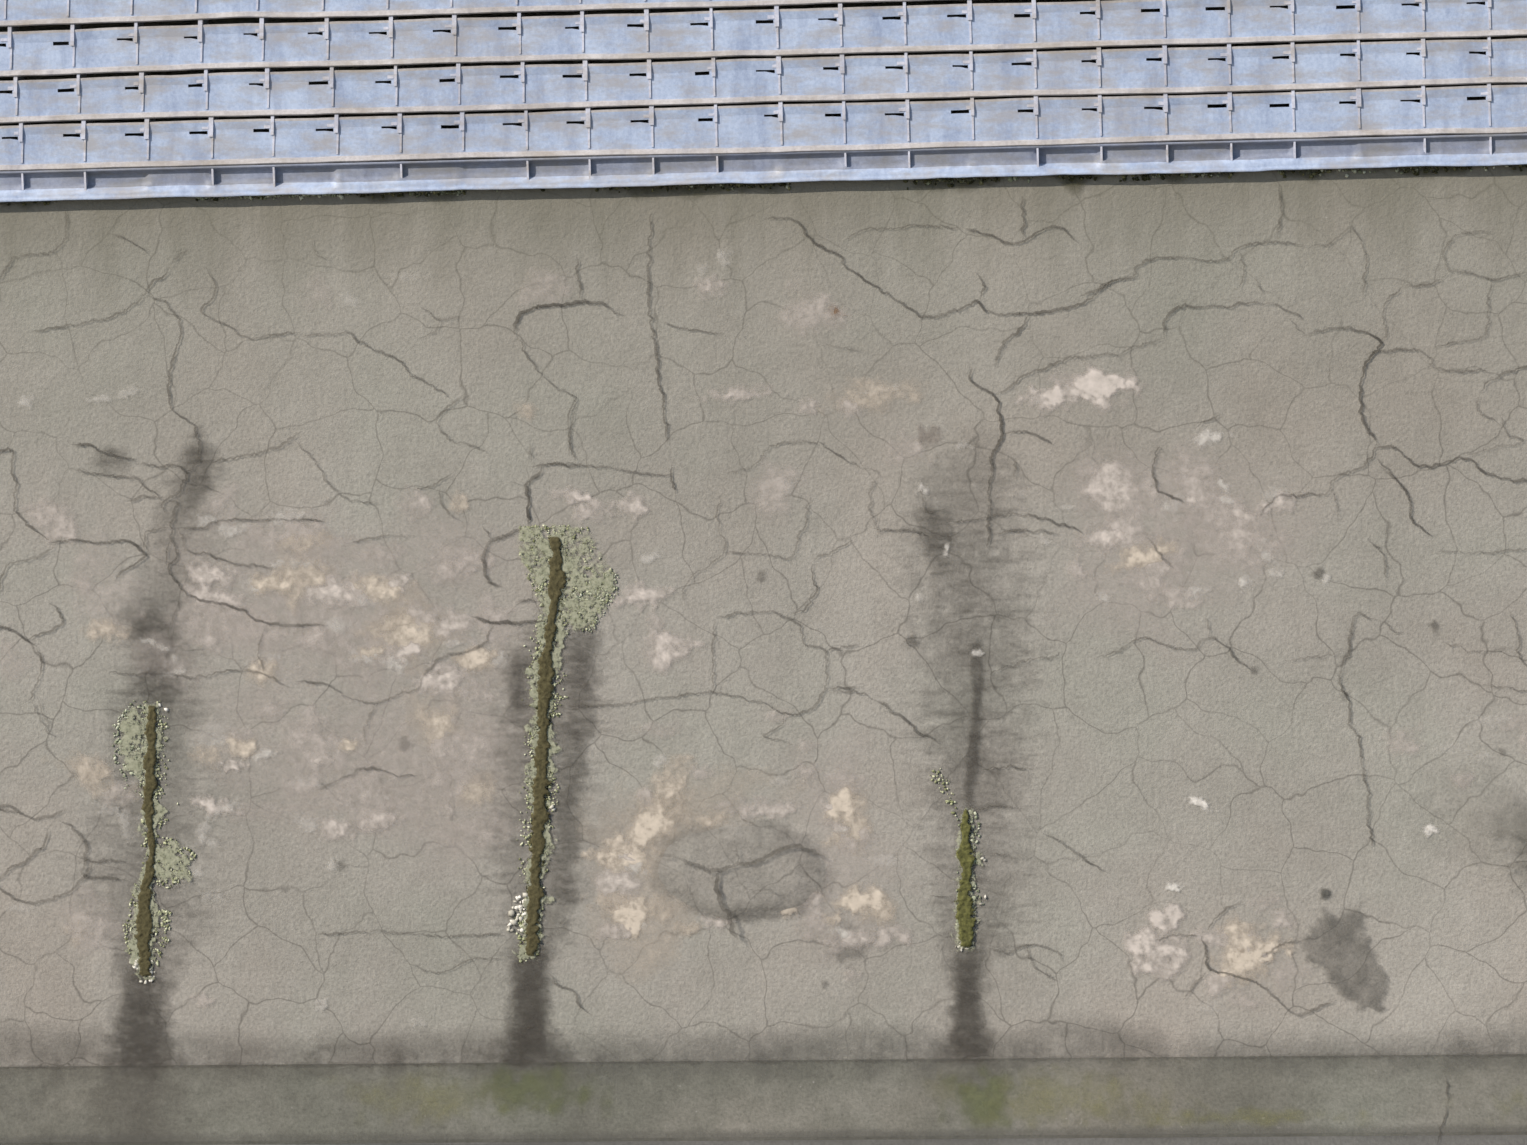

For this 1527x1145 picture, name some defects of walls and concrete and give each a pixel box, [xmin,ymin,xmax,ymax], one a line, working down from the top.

crack [514,285,606,325]
crack [802,227,911,309]
crack [966,257,1170,335]
crack [651,327,667,430]
crack [968,375,1015,488]
crack [1356,330,1527,482]
crack [505,463,555,537]
crack [32,529,308,627]
crack [485,576,538,625]
crack [1340,641,1373,841]
peeling [1125,883,1293,994]
crack [1204,944,1222,973]